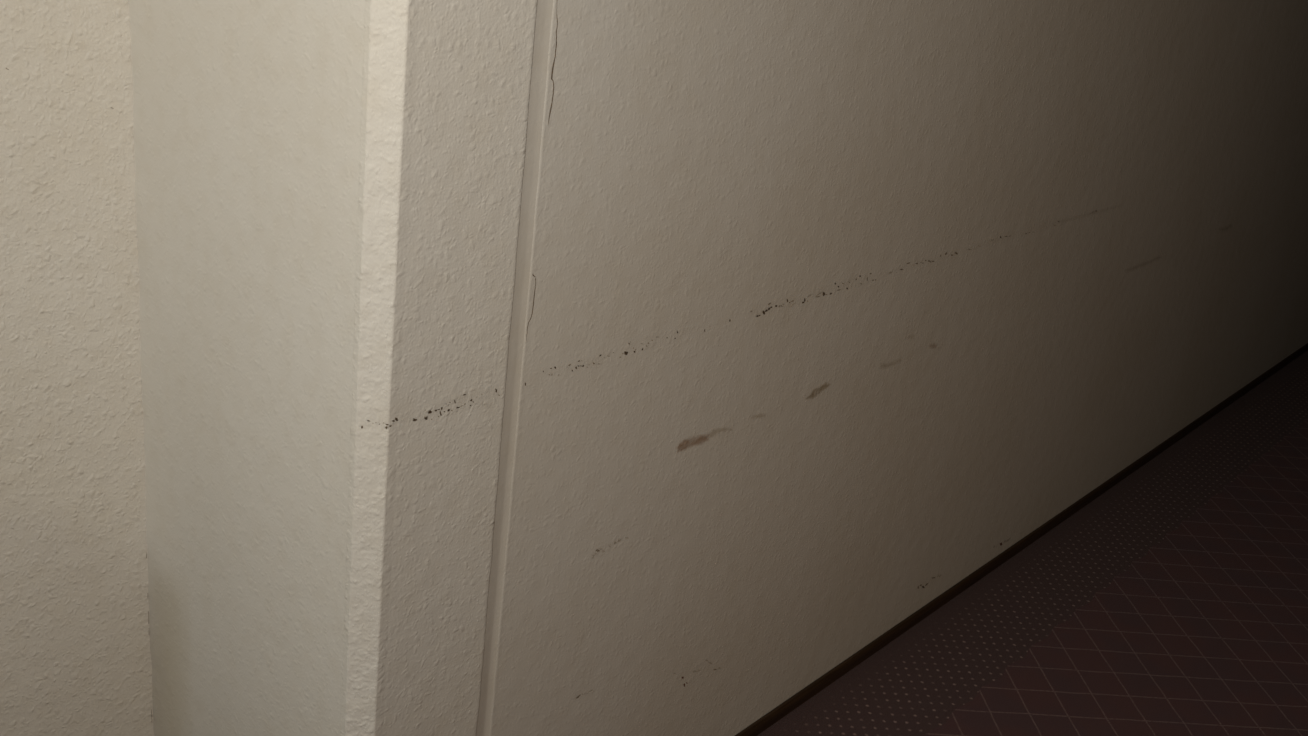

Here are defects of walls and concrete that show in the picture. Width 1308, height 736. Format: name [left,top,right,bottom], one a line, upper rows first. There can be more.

crack [549,20,558,117]